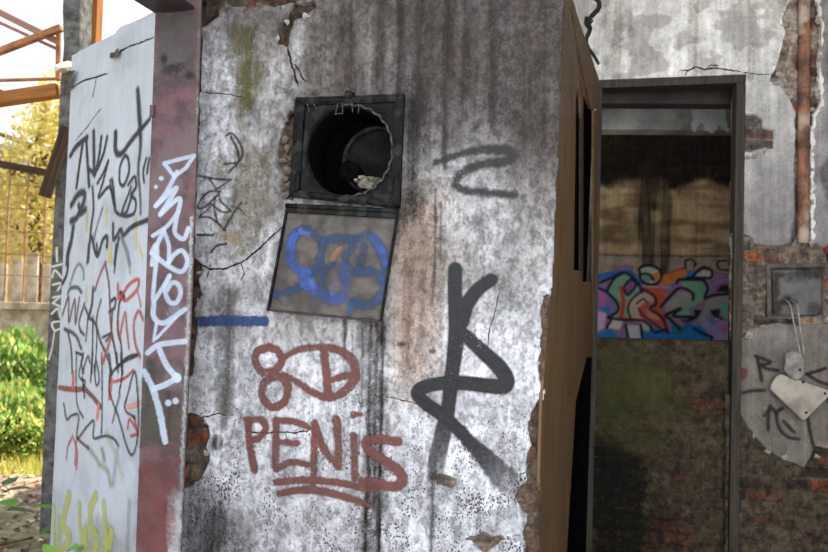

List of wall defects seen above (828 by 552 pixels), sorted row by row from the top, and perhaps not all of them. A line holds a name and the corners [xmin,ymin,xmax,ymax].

spalling [197,0,316,47]
crack [287,48,305,88]
crack [680,64,771,76]
crack [201,227,282,281]
leakage [638,164,682,274]
spalling [742,0,828,339]
spalling [166,216,210,552]
leakage [358,322,388,552]
spalling [515,401,541,552]
spalling [538,294,549,386]
flaking render [738,417,828,552]
spalling [465,531,504,552]